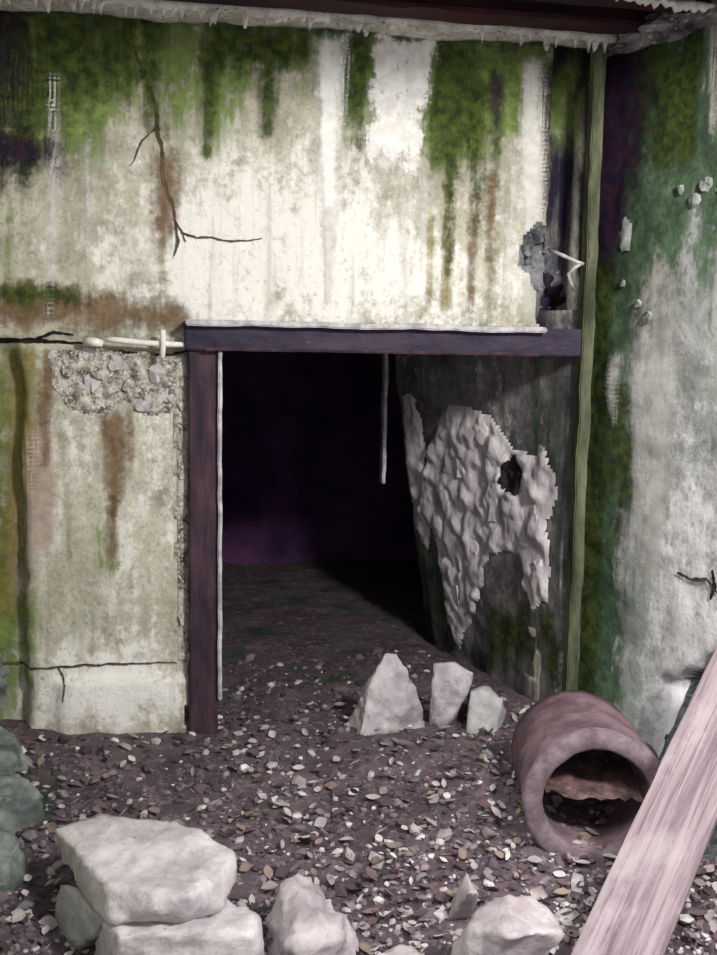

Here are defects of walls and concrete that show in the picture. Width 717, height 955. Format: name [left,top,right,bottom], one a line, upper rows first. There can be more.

peeling [615,0,716,13]
leakage [0,11,161,288]
crack [130,43,262,257]
leakage [199,25,505,301]
leakage [507,59,553,235]
crack [0,330,188,356]
leakage [578,24,717,692]
spalling [48,347,190,663]
flaking render [402,393,558,651]